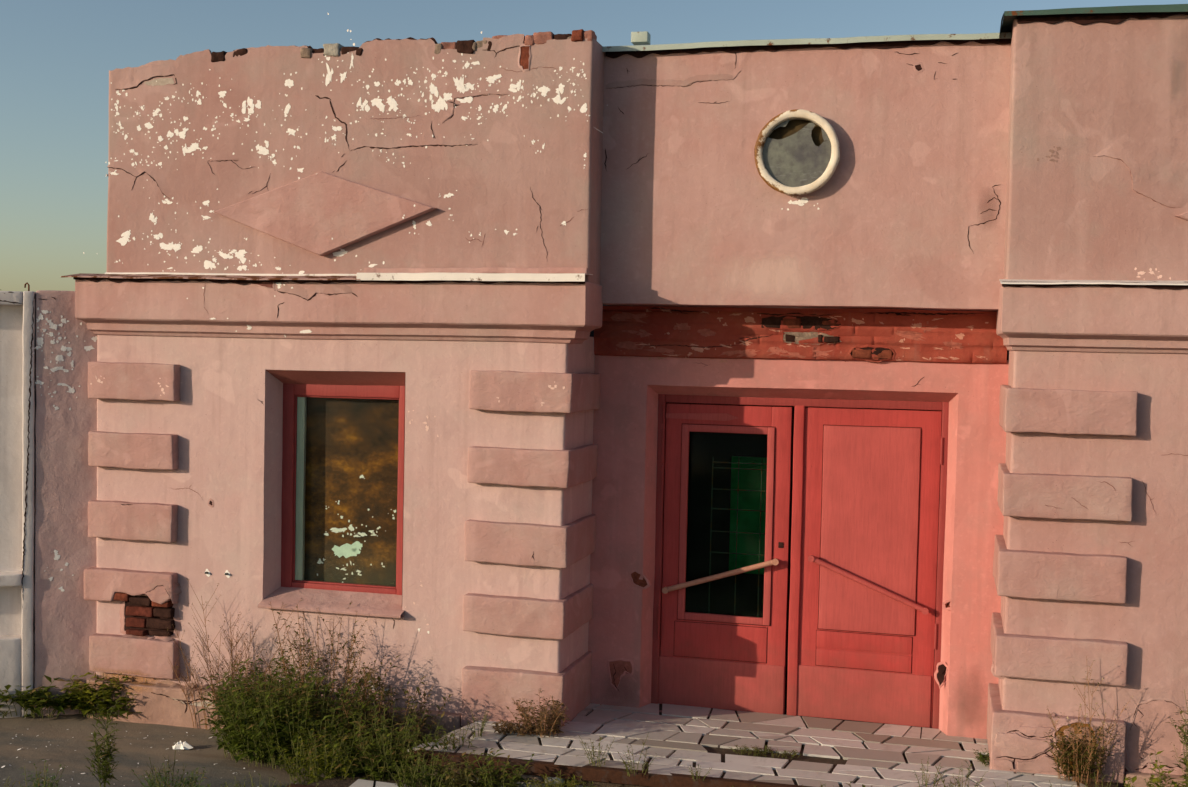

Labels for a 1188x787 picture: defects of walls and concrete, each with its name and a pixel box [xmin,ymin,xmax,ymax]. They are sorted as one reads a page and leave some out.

crack [115,59,181,90]
peeling [105,69,317,179]
crack [315,34,556,173]
peeling [318,29,603,168]
crack [107,158,173,199]
peeling [116,180,305,297]
crack [531,191,587,258]
crack [968,184,1001,250]
crack [274,283,357,317]
spalling [610,307,989,363]
flaking render [114,592,182,642]
spalling [934,661,948,689]